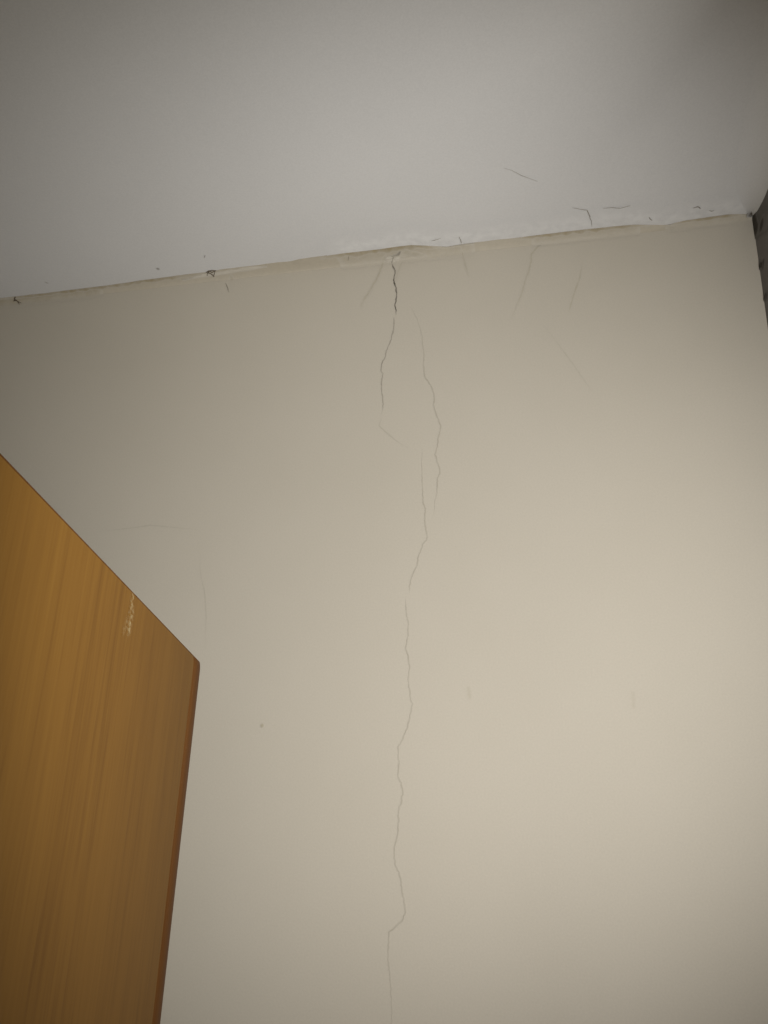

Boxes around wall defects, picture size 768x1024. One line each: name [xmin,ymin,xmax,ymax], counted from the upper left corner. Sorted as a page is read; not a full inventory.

crack [361,249,442,1024]